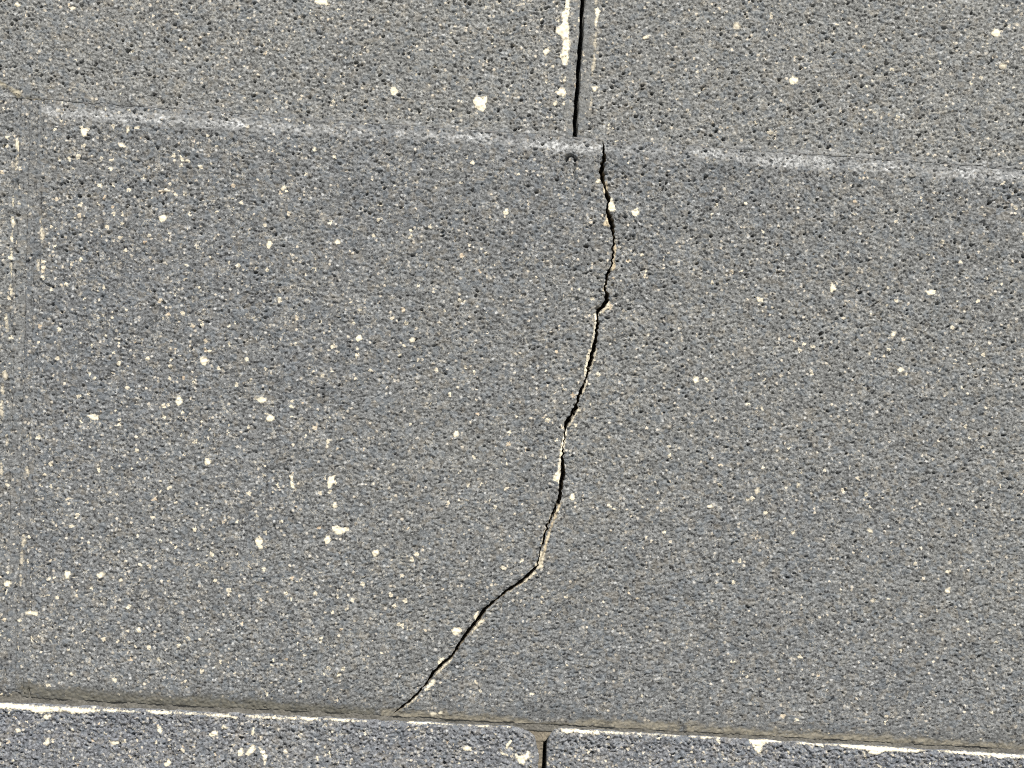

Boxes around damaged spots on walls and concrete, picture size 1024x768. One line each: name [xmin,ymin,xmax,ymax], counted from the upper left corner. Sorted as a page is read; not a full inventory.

crack [394,142,617,713]